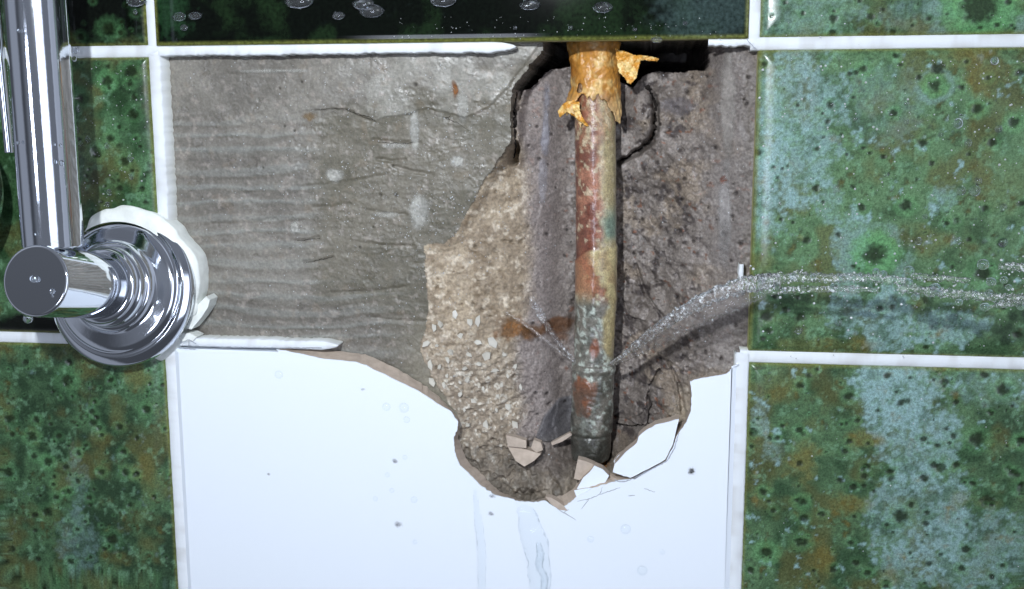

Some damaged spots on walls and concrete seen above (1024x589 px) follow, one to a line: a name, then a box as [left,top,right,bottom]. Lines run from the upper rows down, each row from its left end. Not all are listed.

crack [620,84,658,162]
spalling [420,42,580,501]
spalling [606,40,757,474]
peeling [179,293,218,341]
corrosion [494,317,571,339]